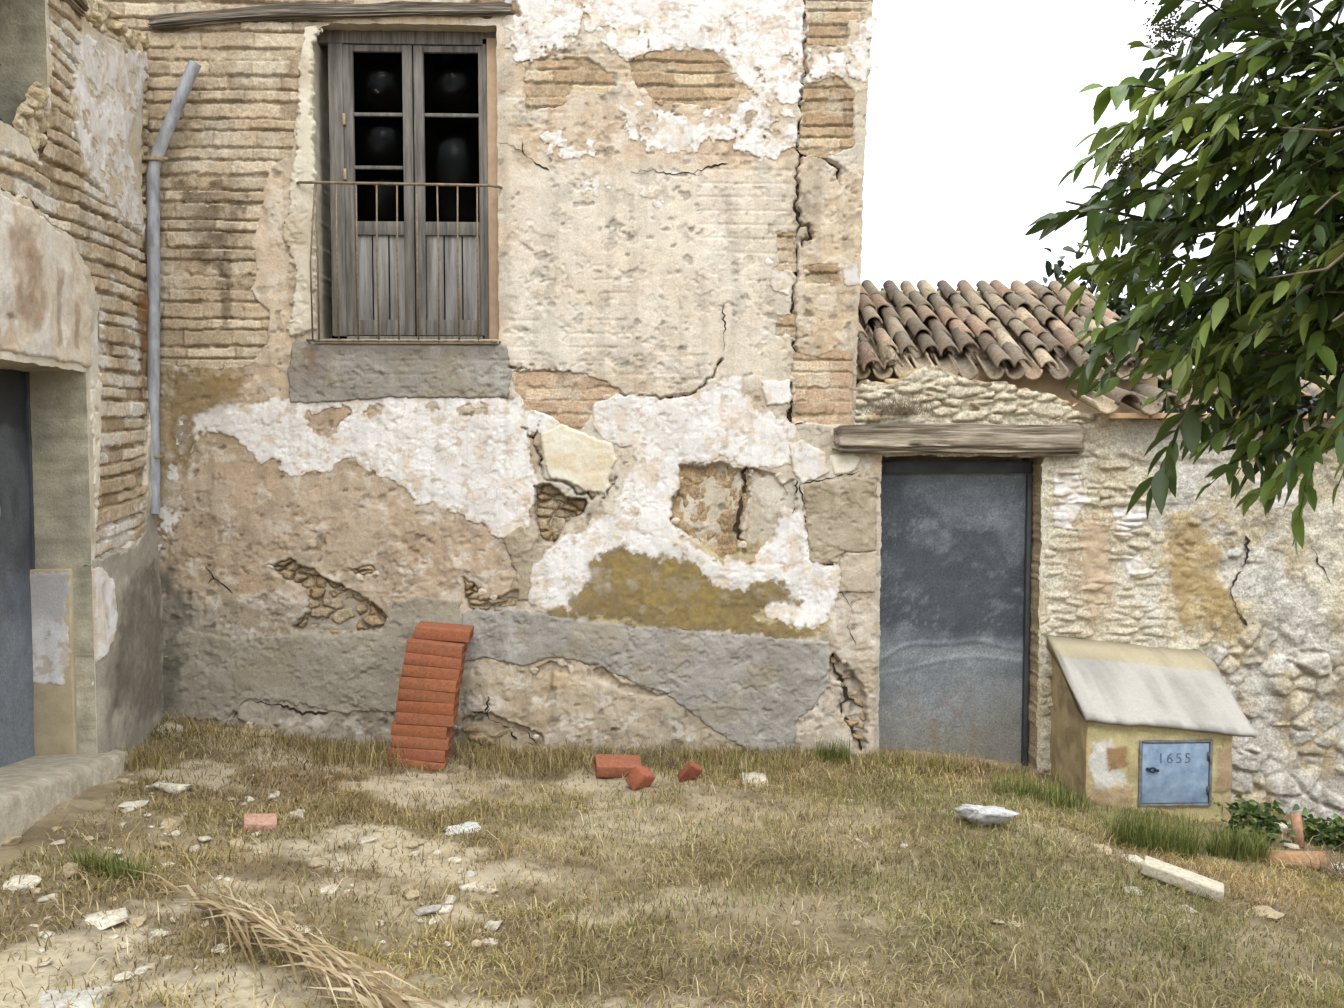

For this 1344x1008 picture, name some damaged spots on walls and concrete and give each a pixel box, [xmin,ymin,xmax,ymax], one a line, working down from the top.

crack [764,13,839,425]
flaking render [0,0,878,664]
crack [667,306,726,398]
crack [733,467,748,540]
crack [783,472,857,533]
peeling [30,571,72,686]
leakage [547,545,814,639]
crack [824,552,862,750]